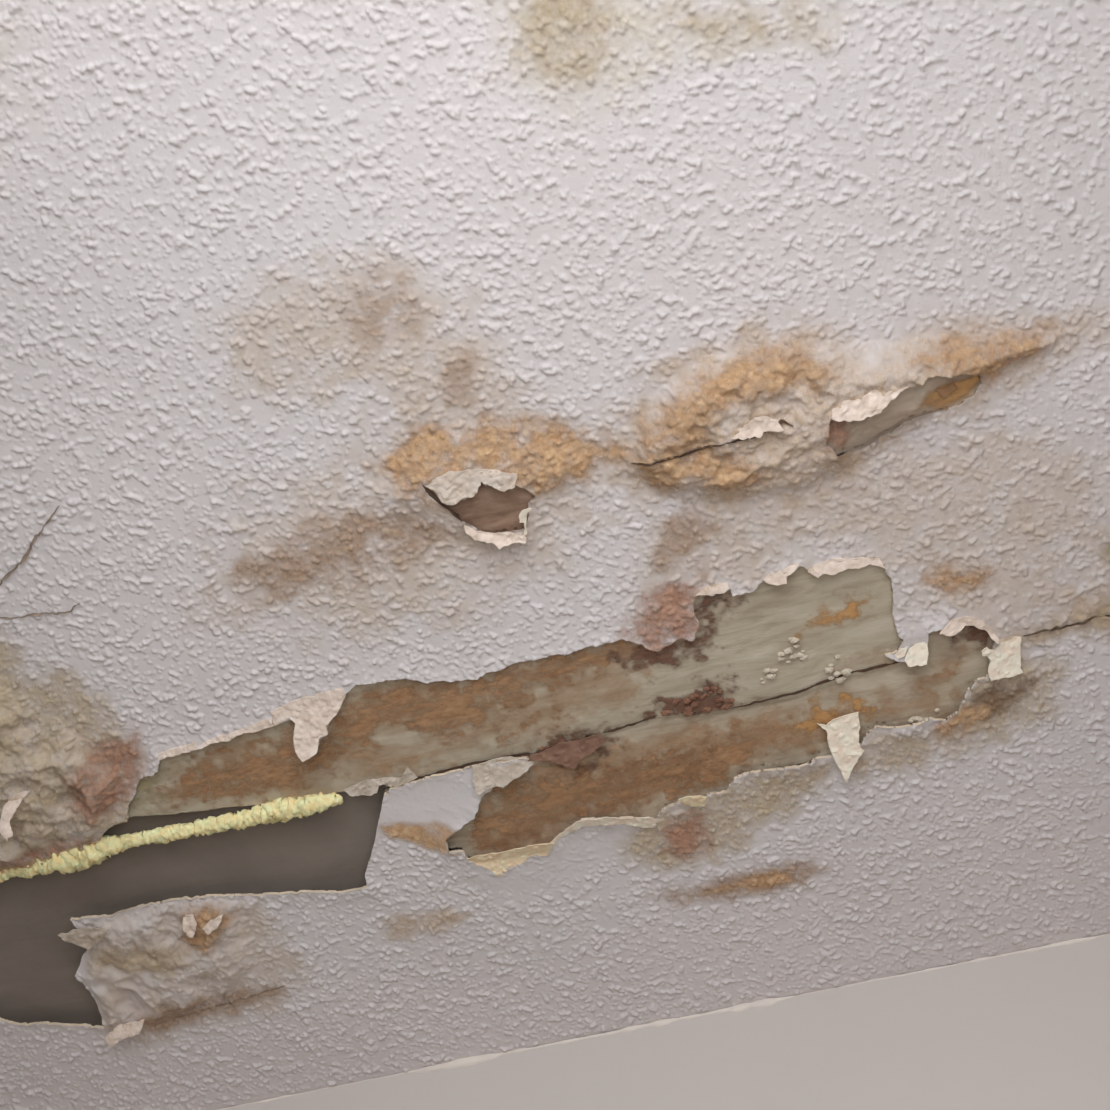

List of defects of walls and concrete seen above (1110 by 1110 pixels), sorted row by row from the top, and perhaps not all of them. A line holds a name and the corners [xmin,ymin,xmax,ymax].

damp [913,333,1039,386]
damp [638,338,853,498]
damp [385,417,625,494]
crack [0,506,59,586]
crack [0,602,80,620]
crack [1023,613,1110,637]
flaking render [128,557,1023,876]
damp [0,645,139,871]
flaking render [0,791,29,840]
flaking render [58,927,109,950]
flaking render [183,914,223,938]